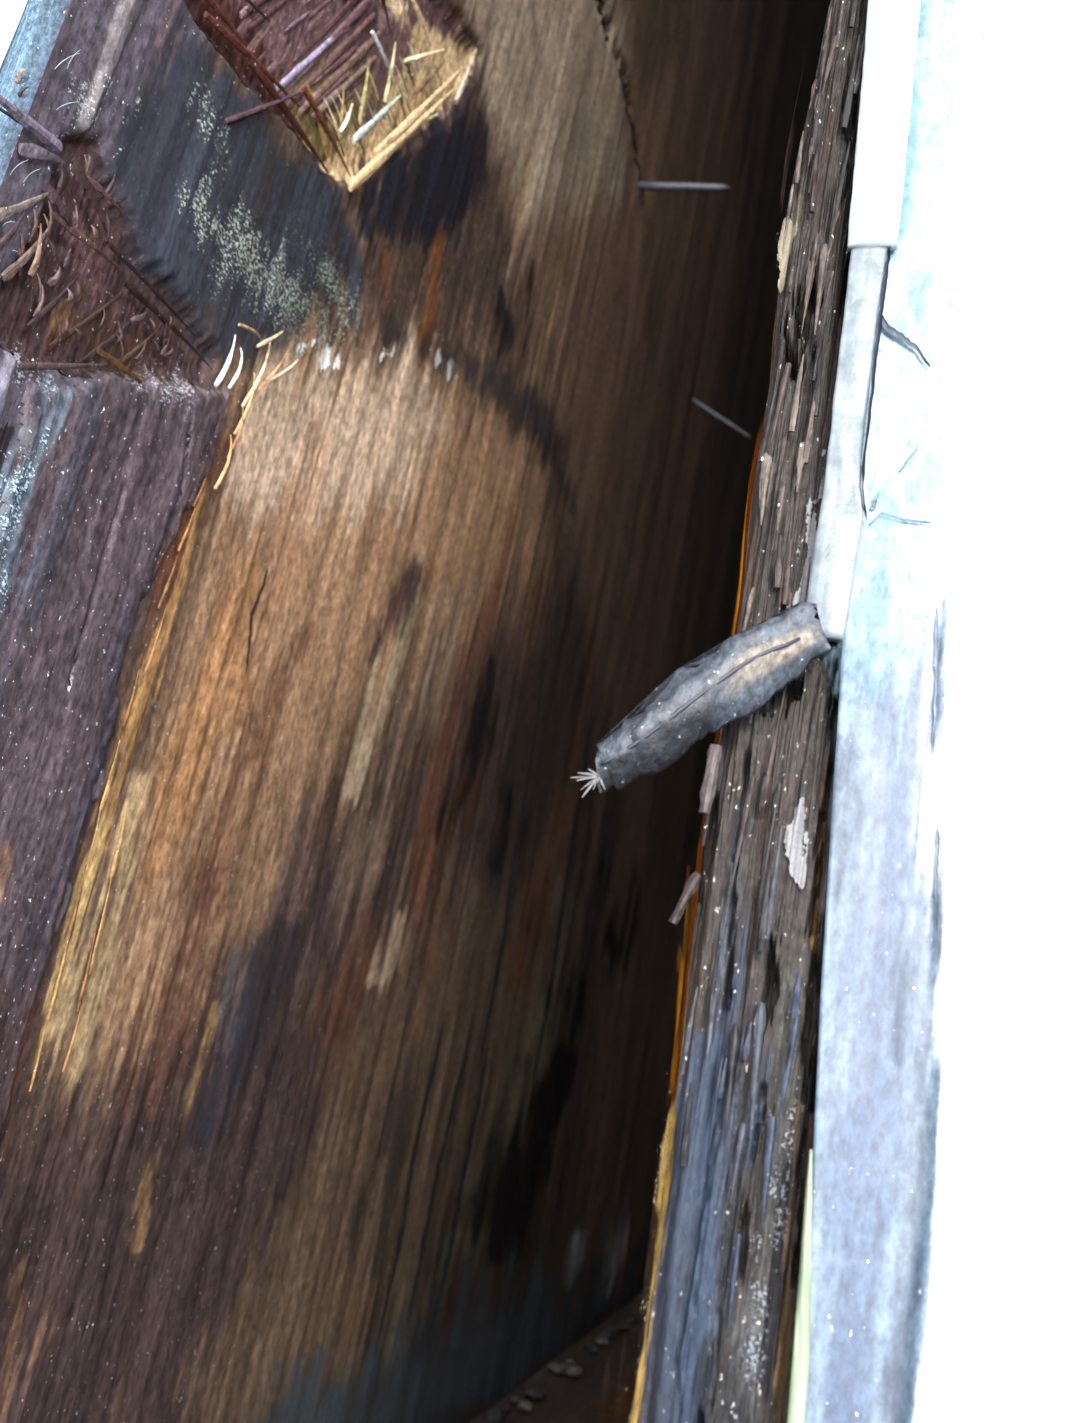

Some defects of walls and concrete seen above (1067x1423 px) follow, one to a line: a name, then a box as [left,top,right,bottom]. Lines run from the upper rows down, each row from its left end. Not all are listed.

leakage [98,3,489,374]
crack [596,0,644,196]